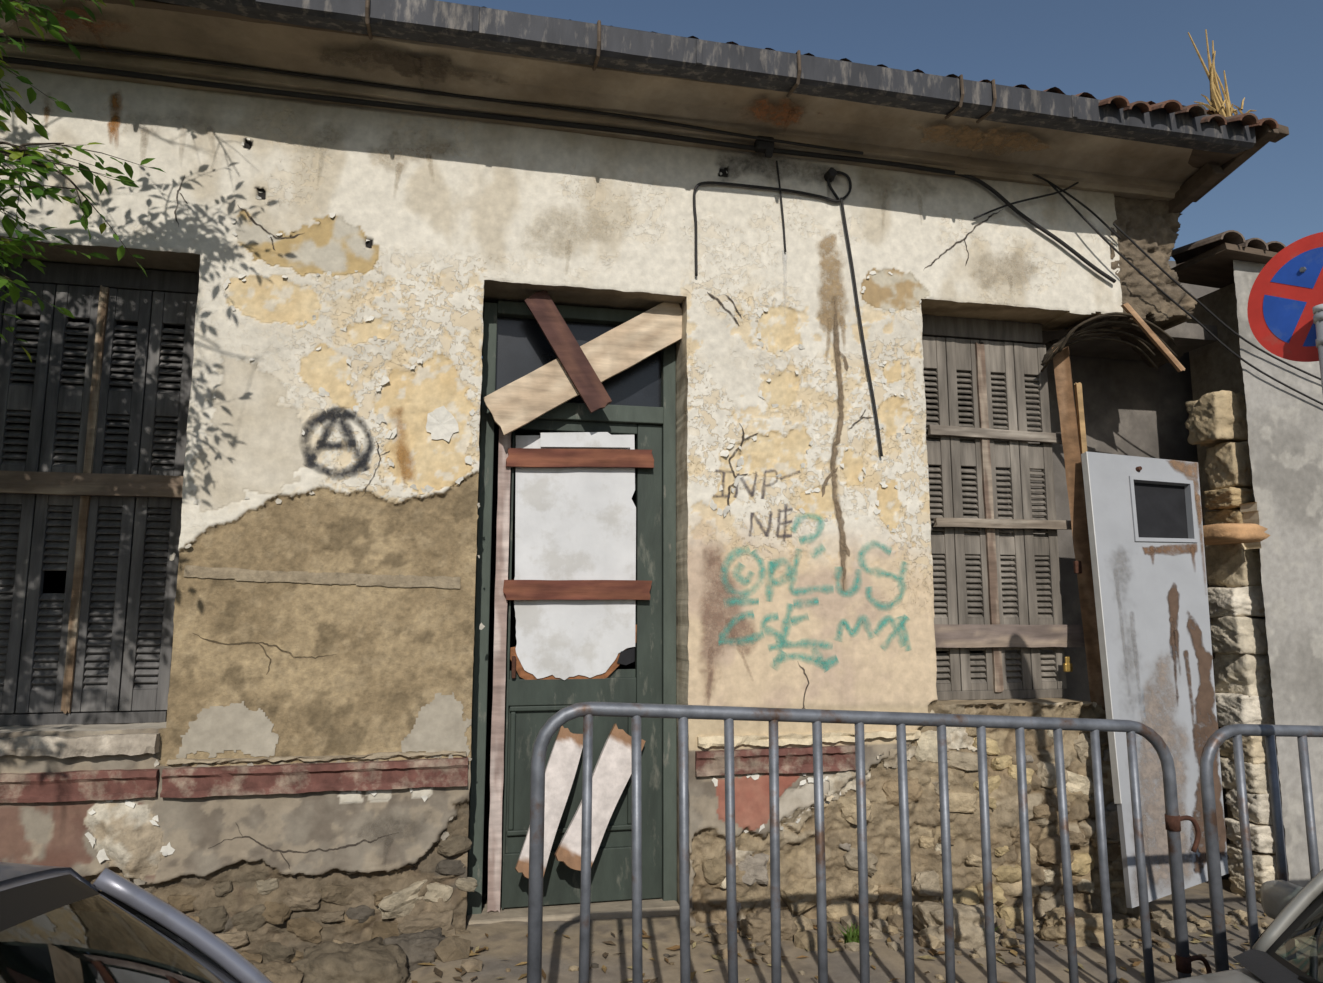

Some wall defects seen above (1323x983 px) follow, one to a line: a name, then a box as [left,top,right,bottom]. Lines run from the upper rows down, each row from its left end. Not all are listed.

spalling [223,210,378,328]
peeling [756,306,805,357]
leakage [819,236,845,342]
spalling [861,269,929,313]
peeling [877,361,913,438]
peeling [710,425,813,517]
peeling [794,446,901,534]
corrosion [1143,460,1205,572]
crack [193,633,336,675]
flaking render [84,315,511,963]
corrosion [1168,584,1226,873]
crack [210,832,399,869]